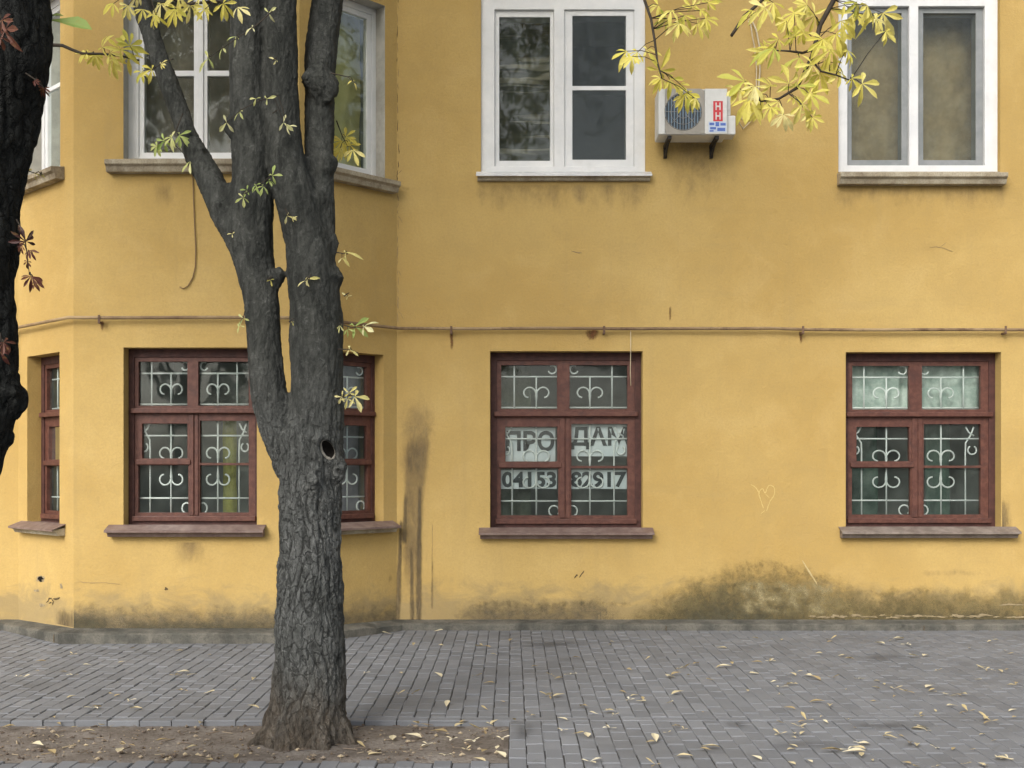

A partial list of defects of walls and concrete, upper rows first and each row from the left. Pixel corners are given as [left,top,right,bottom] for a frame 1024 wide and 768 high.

water stain [344,445,433,624]
water stain [640,575,1024,620]